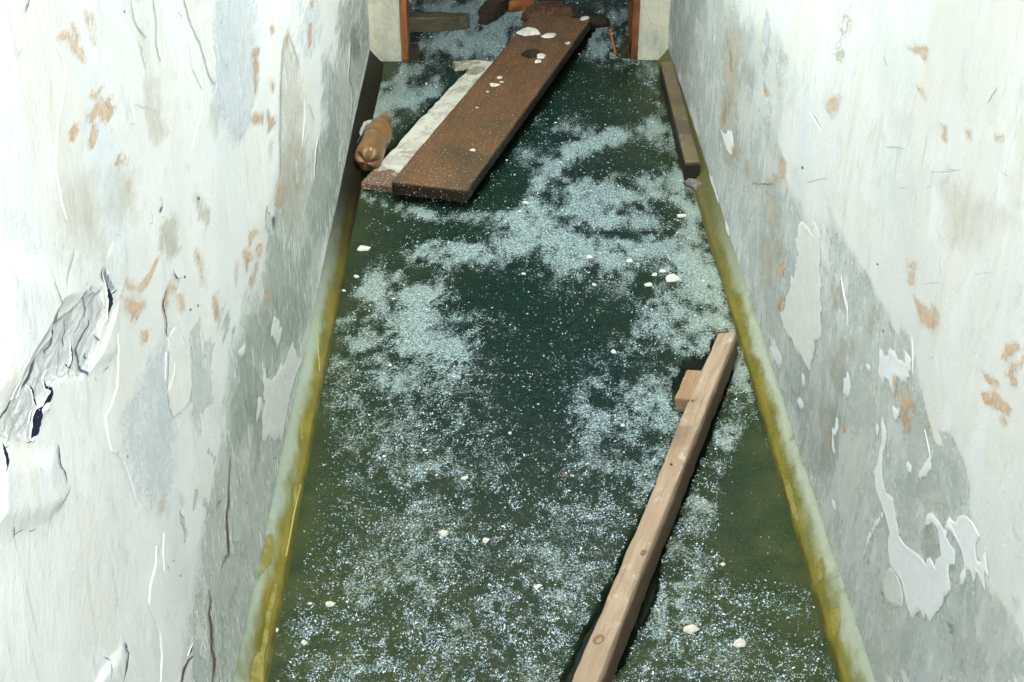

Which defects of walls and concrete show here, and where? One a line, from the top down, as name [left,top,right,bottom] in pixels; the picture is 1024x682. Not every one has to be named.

corrosion [90,87,113,147]
corrosion [245,230,262,281]
peeling [770,219,822,413]
flaking render [0,269,116,441]
leakage [199,9,367,682]
peeling [843,371,852,398]
peeling [866,347,912,392]
corrosion [982,376,1010,415]
corrosion [1002,344,1024,385]
peeling [863,405,988,634]
leakage [949,537,964,577]
leakage [830,606,841,641]